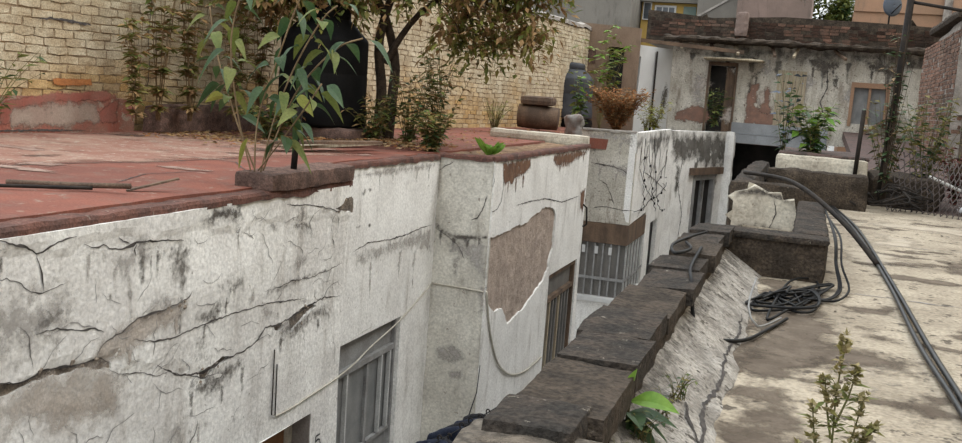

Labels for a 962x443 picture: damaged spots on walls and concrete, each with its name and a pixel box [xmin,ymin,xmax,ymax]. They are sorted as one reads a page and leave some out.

peeling [674,106,732,123]
peeling [744,83,781,125]
spalling [503,158,531,191]
crack [472,142,682,235]
peeling [487,207,554,322]
crack [0,204,464,443]
crack [685,315,743,443]